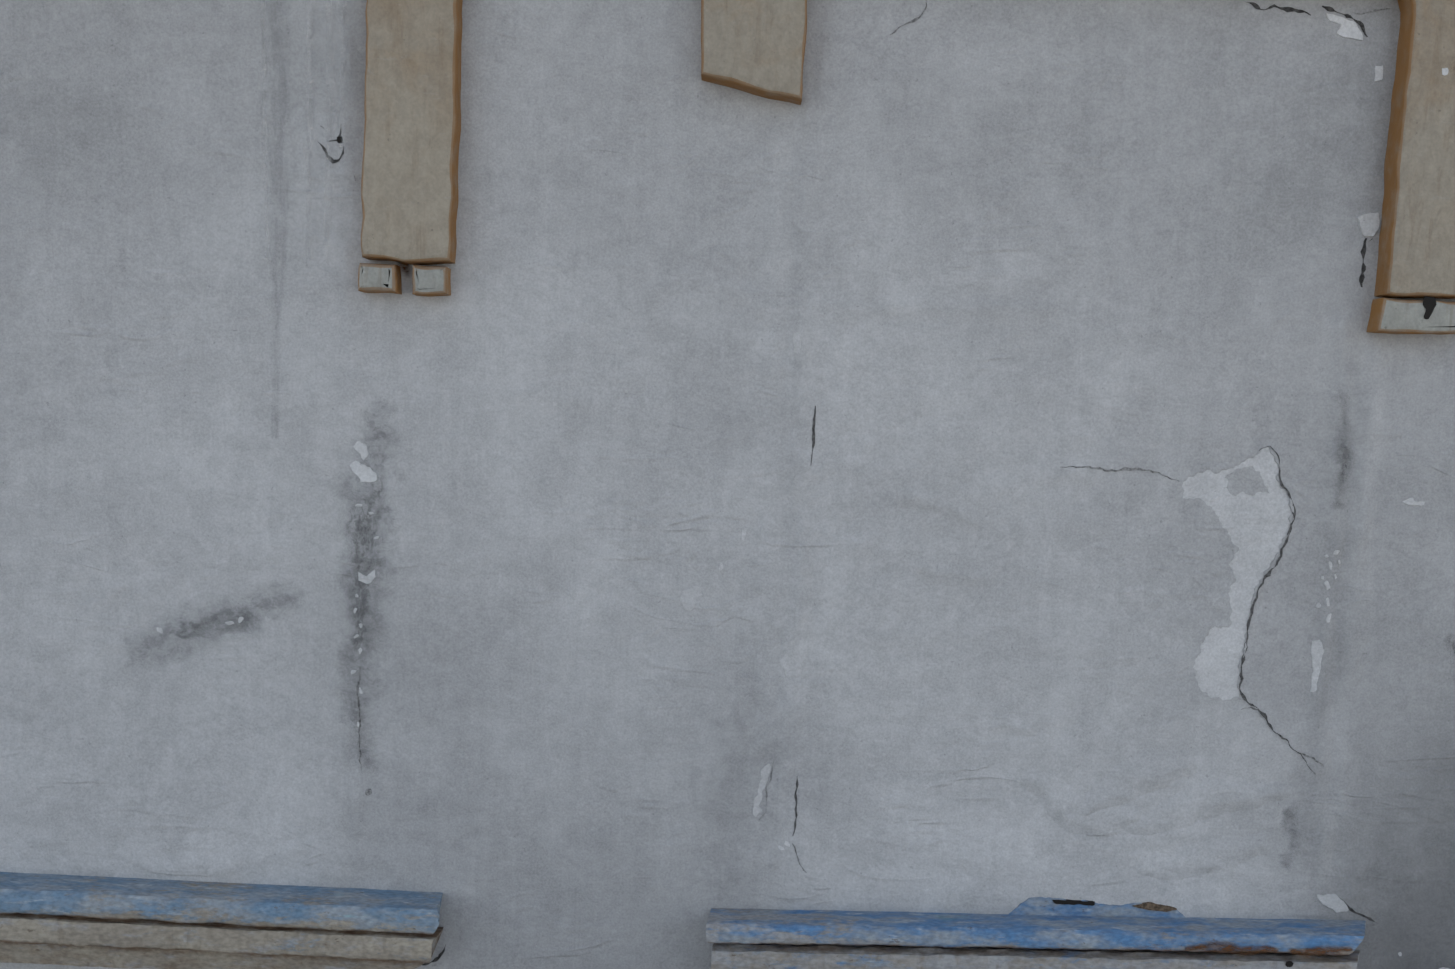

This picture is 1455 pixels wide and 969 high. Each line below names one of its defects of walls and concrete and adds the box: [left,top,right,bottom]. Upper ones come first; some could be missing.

crack [1247,2,1390,41]
leakage [350,440,378,483]
crack [1065,466,1178,481]
leakage [351,569,376,768]
flaking render [1175,441,1301,708]
crack [1239,446,1324,774]